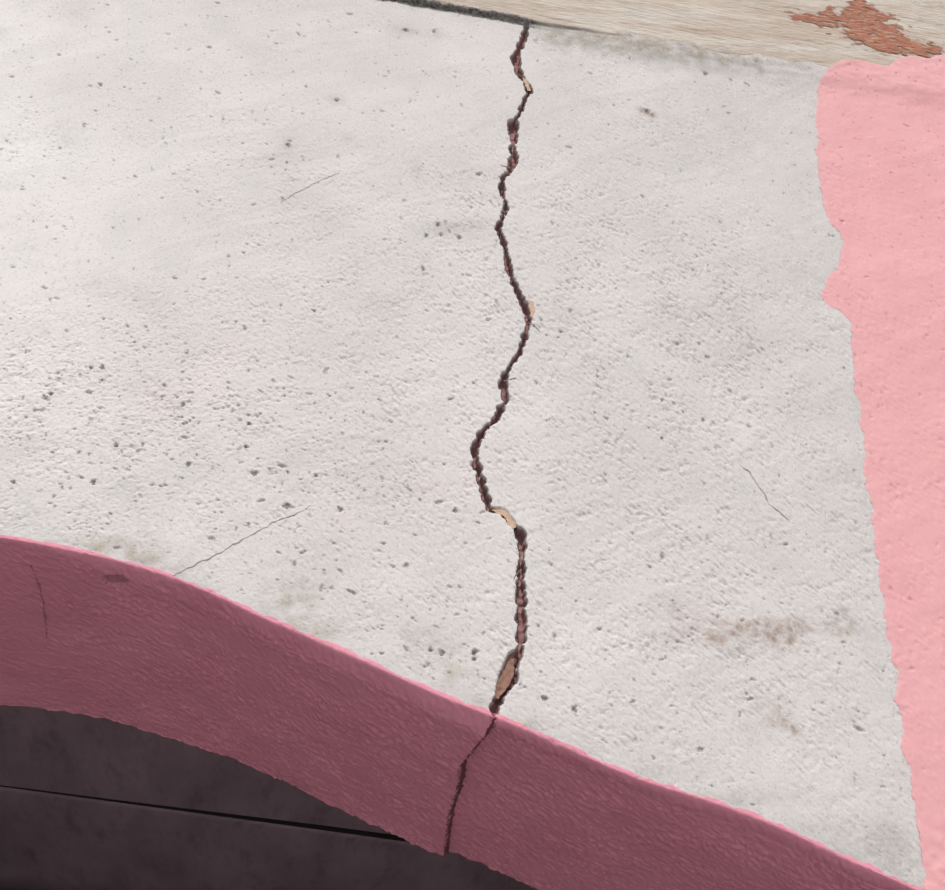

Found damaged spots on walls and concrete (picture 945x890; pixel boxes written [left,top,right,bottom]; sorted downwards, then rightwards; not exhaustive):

crack [382,0,539,856]
peeling [788,0,945,58]